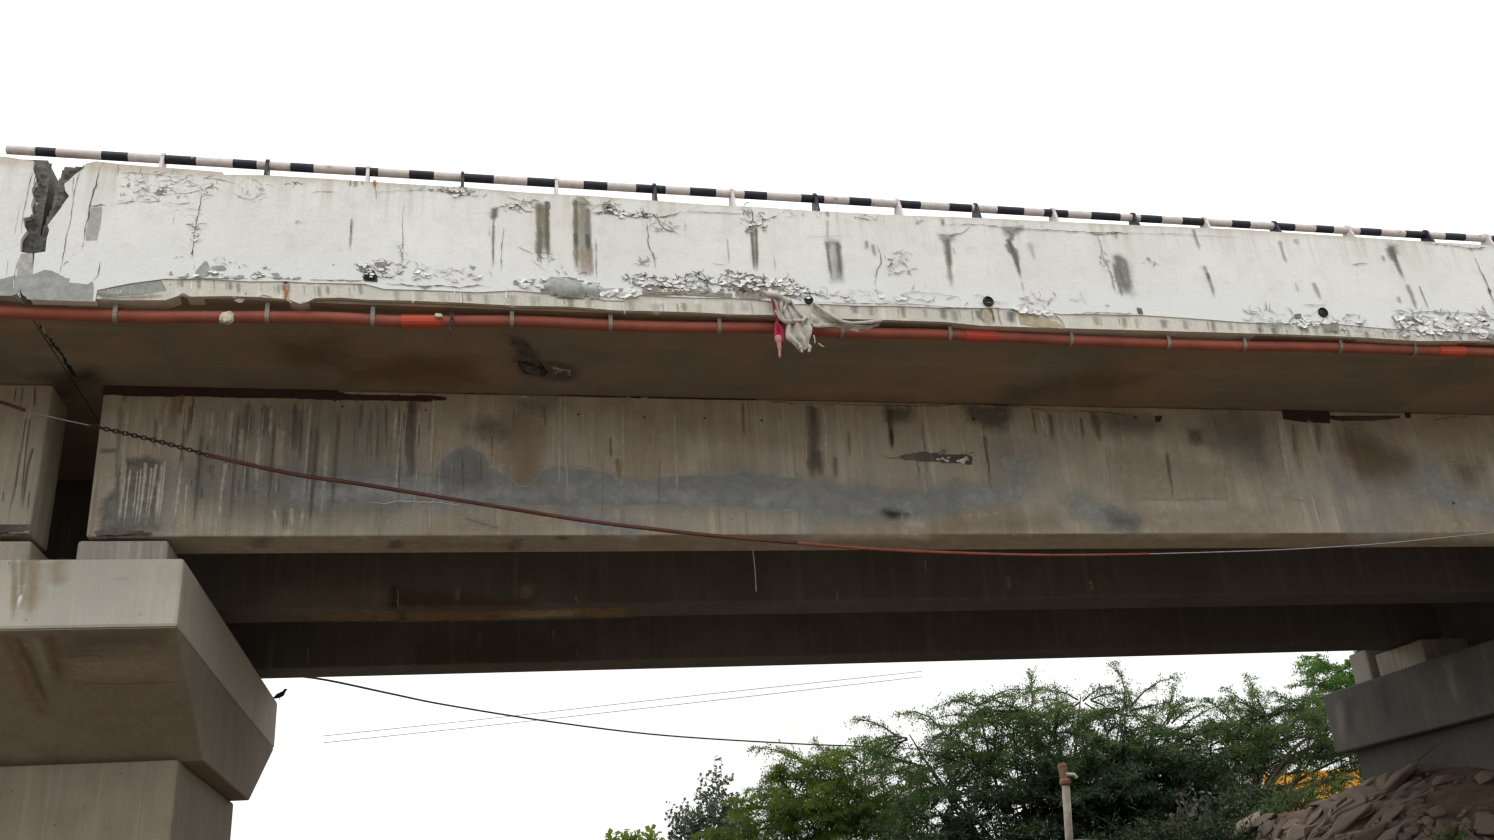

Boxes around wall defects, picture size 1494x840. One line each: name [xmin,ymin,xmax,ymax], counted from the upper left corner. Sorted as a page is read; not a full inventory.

spalling [22,162,85,257]
leakage [489,196,599,276]
leakage [706,202,769,264]
leakage [826,242,842,273]
peeling [622,263,1143,326]
leakage [935,206,969,277]
leakage [1005,227,1021,273]
leakage [1098,238,1159,293]
peeling [1243,300,1494,341]
leakage [1382,246,1427,306]
leakage [104,398,1038,536]
spalling [881,449,973,482]